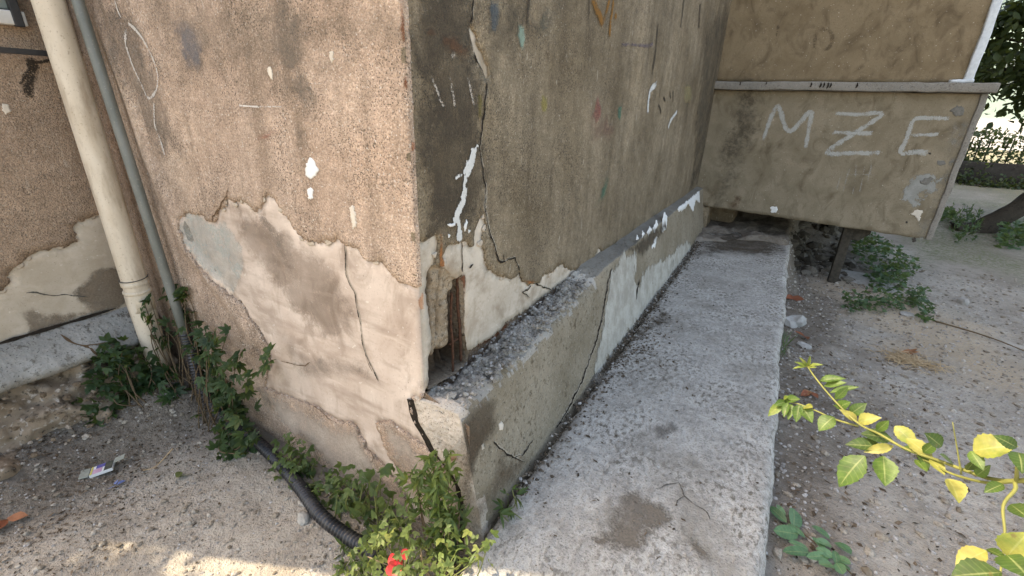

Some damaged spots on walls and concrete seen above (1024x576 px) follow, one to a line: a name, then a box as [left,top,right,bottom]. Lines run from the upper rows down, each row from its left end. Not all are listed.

crack [461,52,551,298]
peeling [902,153,955,223]
crack [0,292,116,356]
peeling [0,215,127,342]
crack [344,245,379,381]
peeling [179,195,575,524]
crack [556,269,612,428]
crack [407,399,464,543]
crack [494,441,533,462]